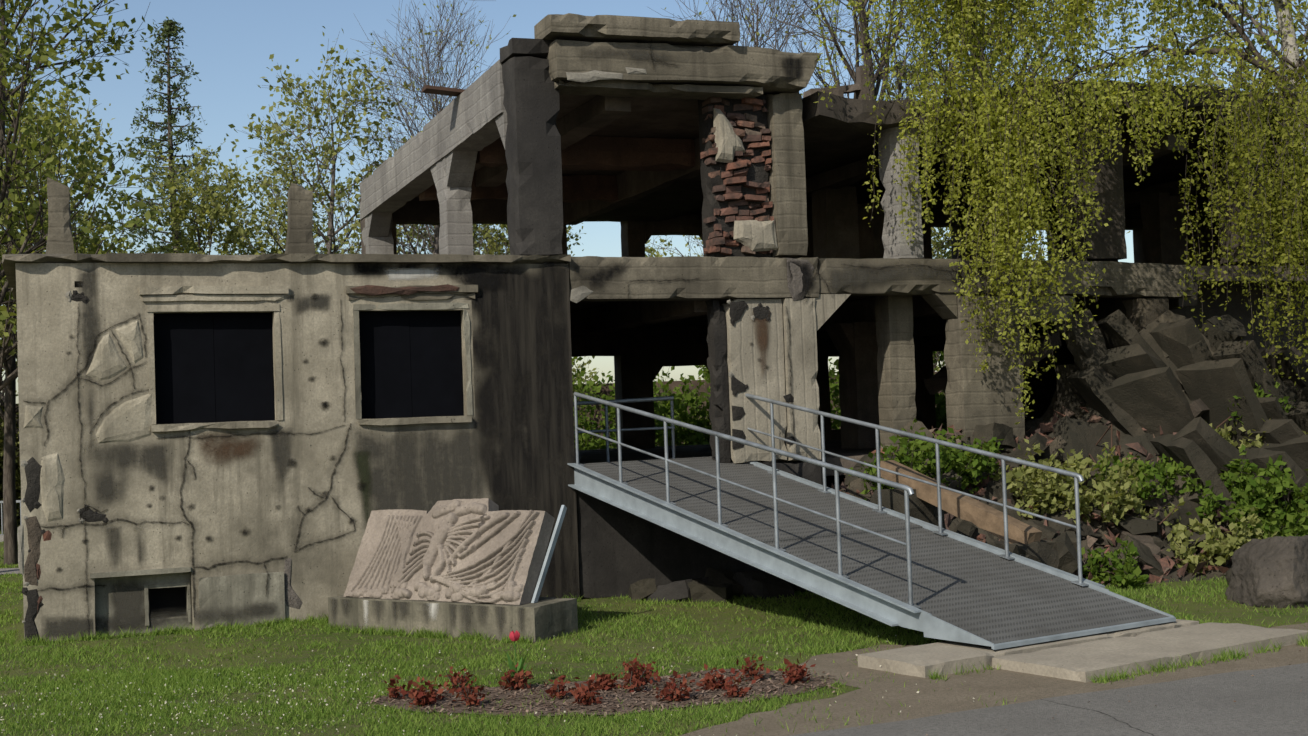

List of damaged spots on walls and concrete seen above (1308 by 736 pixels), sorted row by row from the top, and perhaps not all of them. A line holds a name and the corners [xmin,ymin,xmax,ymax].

leakage [389,269,436,279]
spalling [727,300,771,326]
rust [755,318,768,367]
spalling [728,372,748,449]
leakage [97,446,166,500]
crack [25,311,355,626]
leakage [270,430,290,478]
leakage [358,429,481,512]
spalling [18,457,52,642]